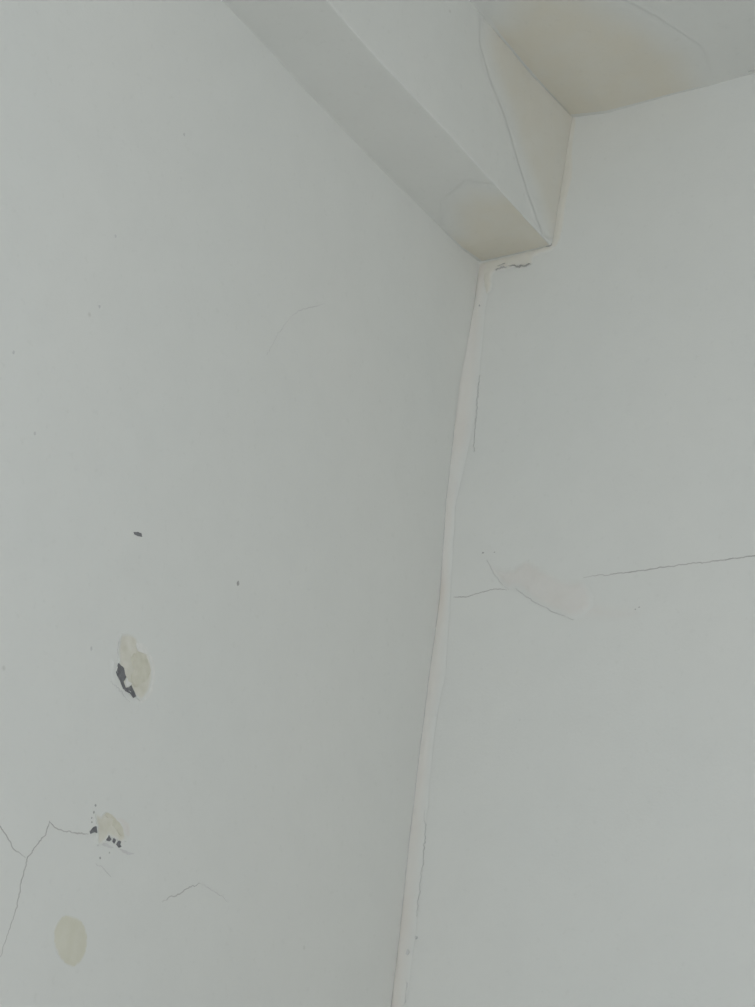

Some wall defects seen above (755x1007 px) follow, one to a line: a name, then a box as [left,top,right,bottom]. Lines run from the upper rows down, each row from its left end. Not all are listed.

crack [584,555,755,578]
flaking render [109,633,155,703]
flaking render [90,804,134,877]
crack [0,821,87,957]